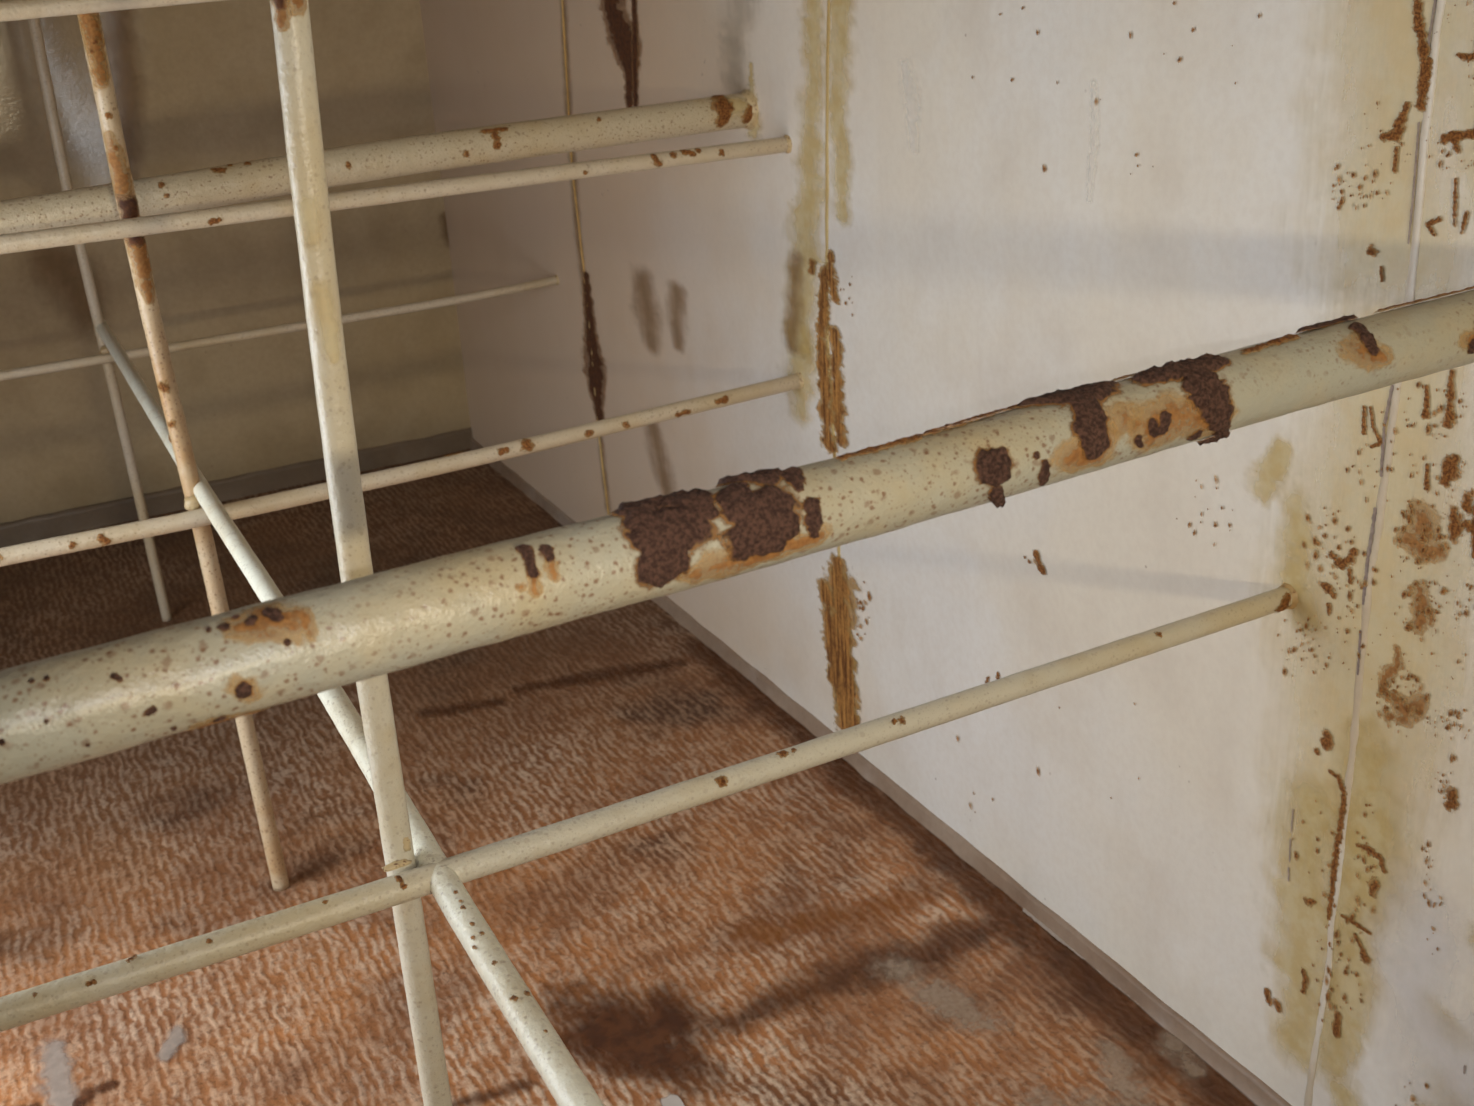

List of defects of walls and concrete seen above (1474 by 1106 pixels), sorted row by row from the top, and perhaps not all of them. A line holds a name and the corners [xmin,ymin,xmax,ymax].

rust [600,0,641,108]
leakage [788,0,850,419]
rust [1331,0,1474,237]
leakage [1342,0,1474,280]
rust [515,544,555,578]
rust [583,272,606,438]
rust [611,466,826,590]
rust [817,552,871,730]
leakage [1256,440,1290,500]
leakage [1275,369,1458,1106]
rust [1274,369,1474,812]
rust [726,758,1245,1106]